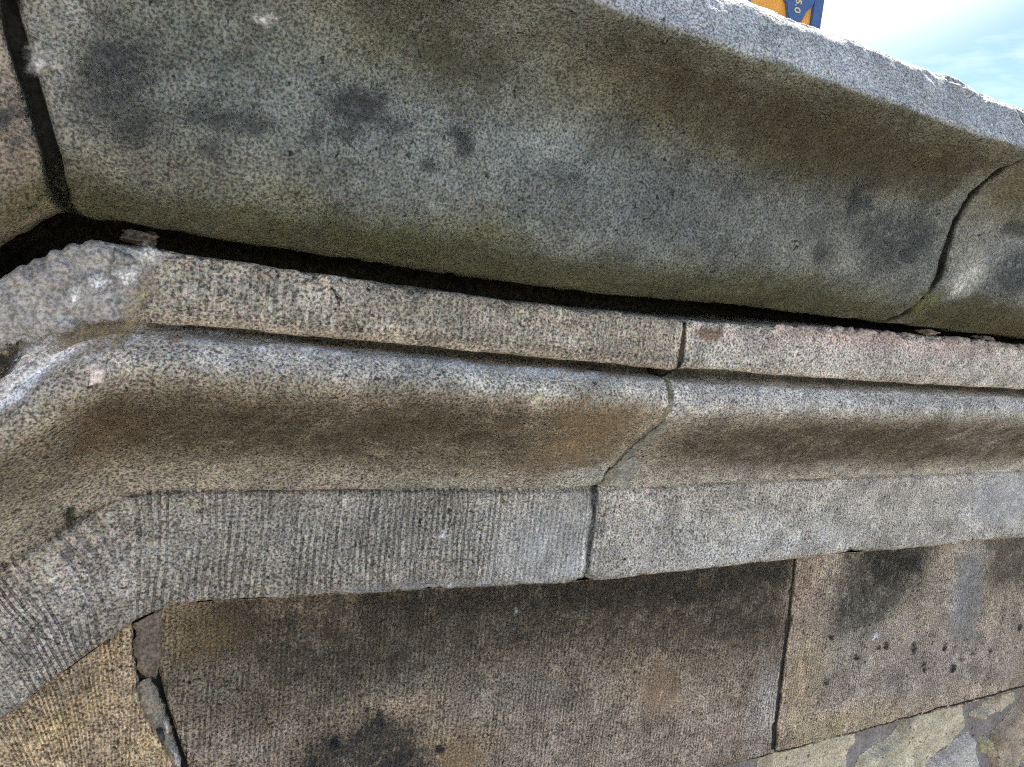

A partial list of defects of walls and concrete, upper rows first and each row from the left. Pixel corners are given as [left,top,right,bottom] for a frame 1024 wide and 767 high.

leakage [303,712,444,767]